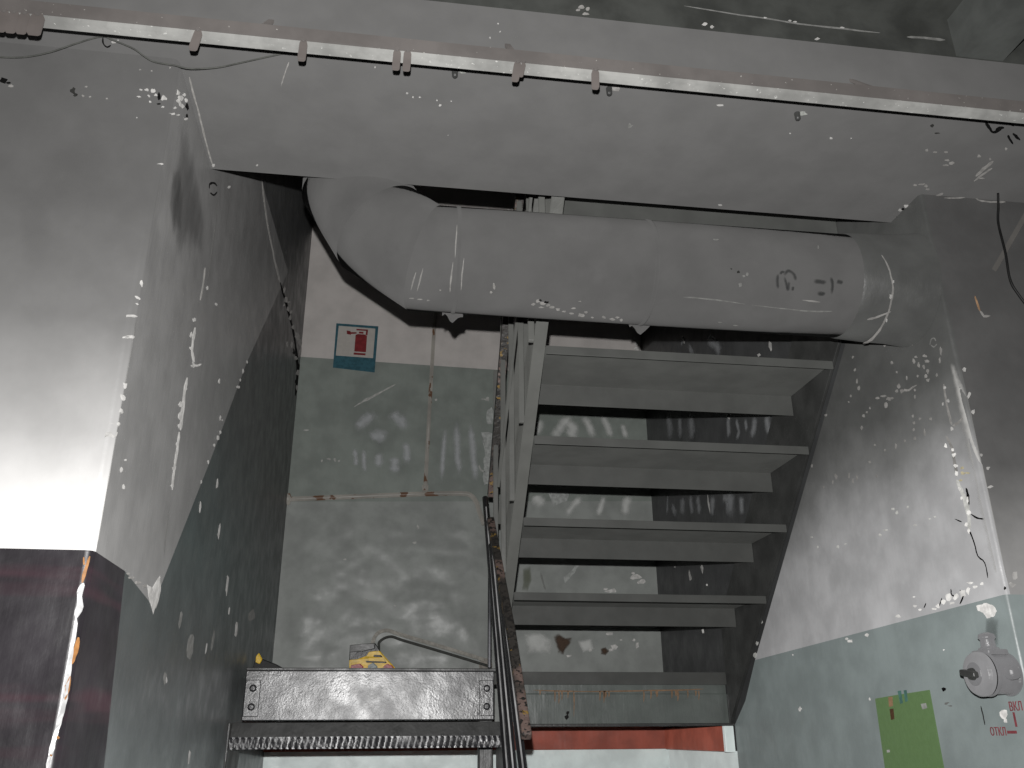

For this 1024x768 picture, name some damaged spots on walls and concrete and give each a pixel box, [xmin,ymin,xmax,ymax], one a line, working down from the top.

spalling [137,88,189,120]
peeling [171,318,201,490]
peeling [861,338,942,430]
crack [942,384,988,578]
peeling [913,582,983,611]
spalling [976,603,997,618]